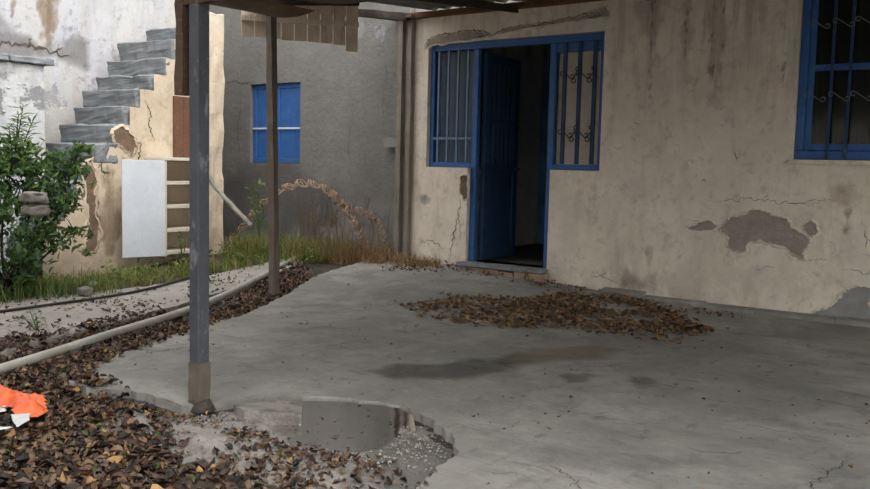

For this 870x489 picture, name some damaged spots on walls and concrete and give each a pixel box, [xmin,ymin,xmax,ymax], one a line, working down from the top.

crack [424,6,606,50]
crack [0,39,72,58]
peeling [0,82,68,116]
flaking render [110,124,139,158]
crack [685,179,837,228]
flaking render [689,207,821,261]
flaking render [811,284,870,320]